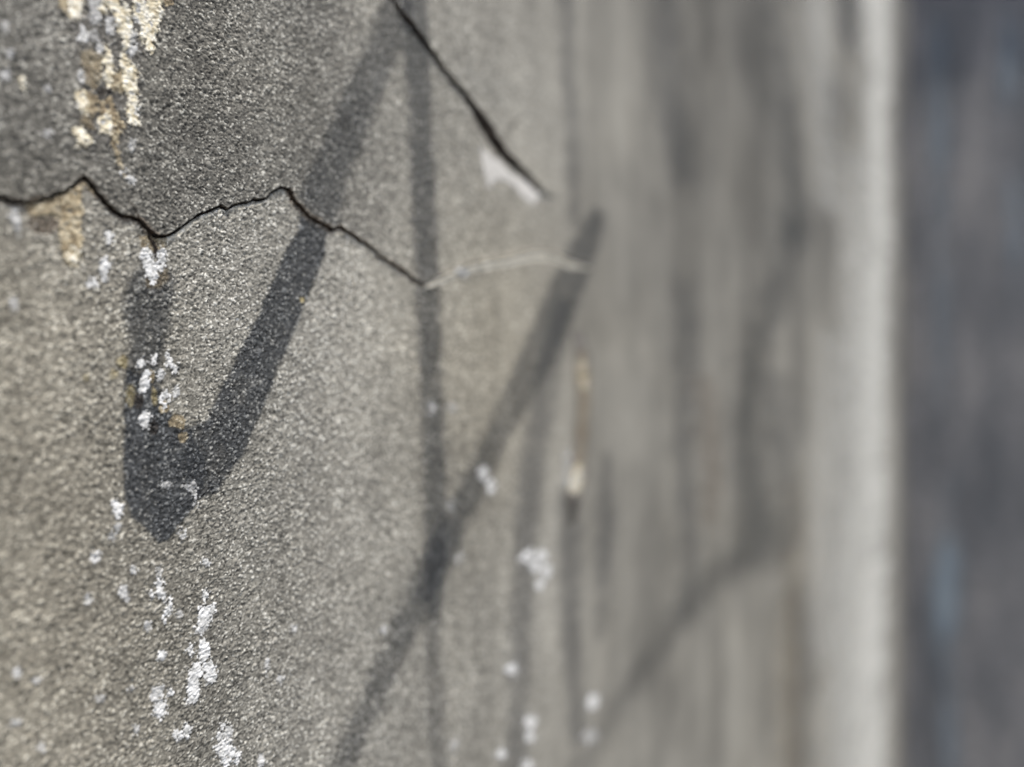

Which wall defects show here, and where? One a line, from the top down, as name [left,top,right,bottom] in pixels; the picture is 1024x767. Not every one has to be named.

peeling [59,0,174,185]
crack [391,0,540,192]
crack [0,176,590,289]